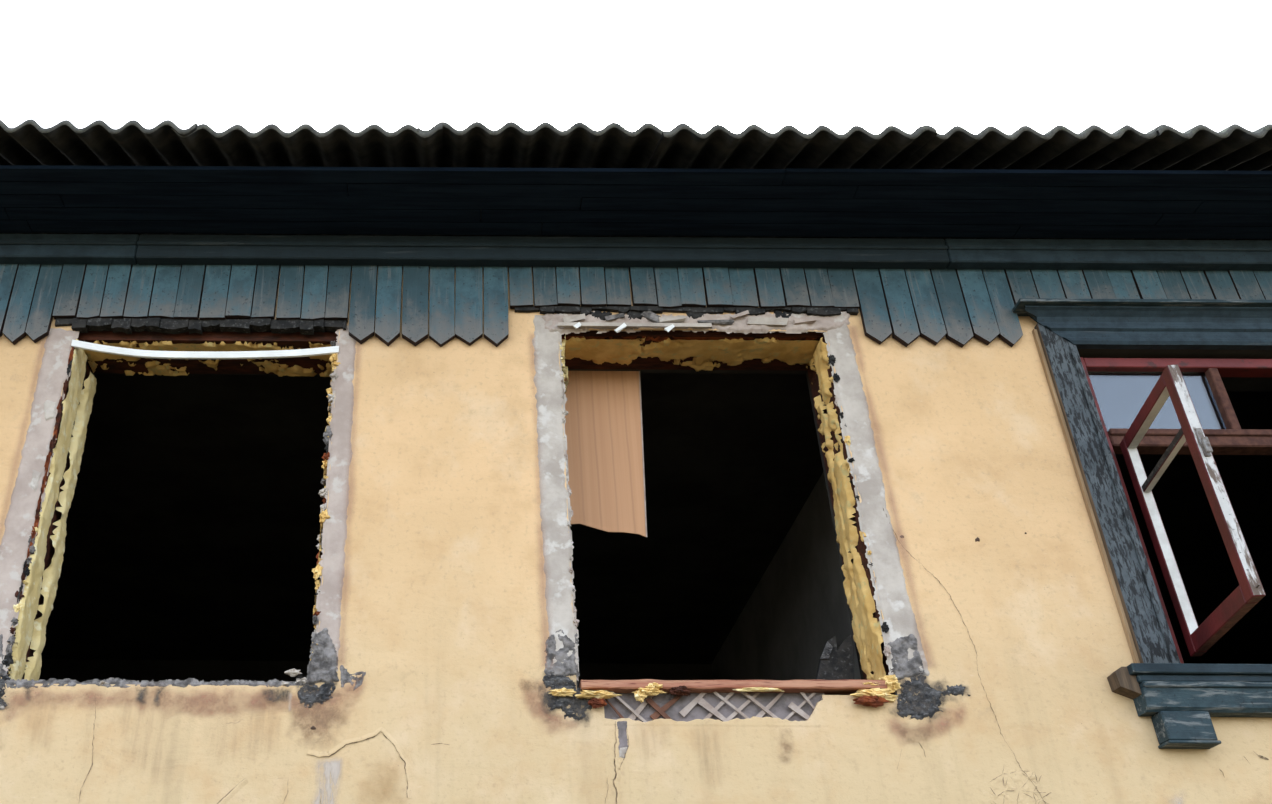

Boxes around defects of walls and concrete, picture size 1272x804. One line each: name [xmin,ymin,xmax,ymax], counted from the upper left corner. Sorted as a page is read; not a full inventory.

flaking render [0,328,79,671]
flaking render [532,310,930,676]
crack [307,727,448,798]
crack [605,717,629,804]
crack [883,508,1051,804]